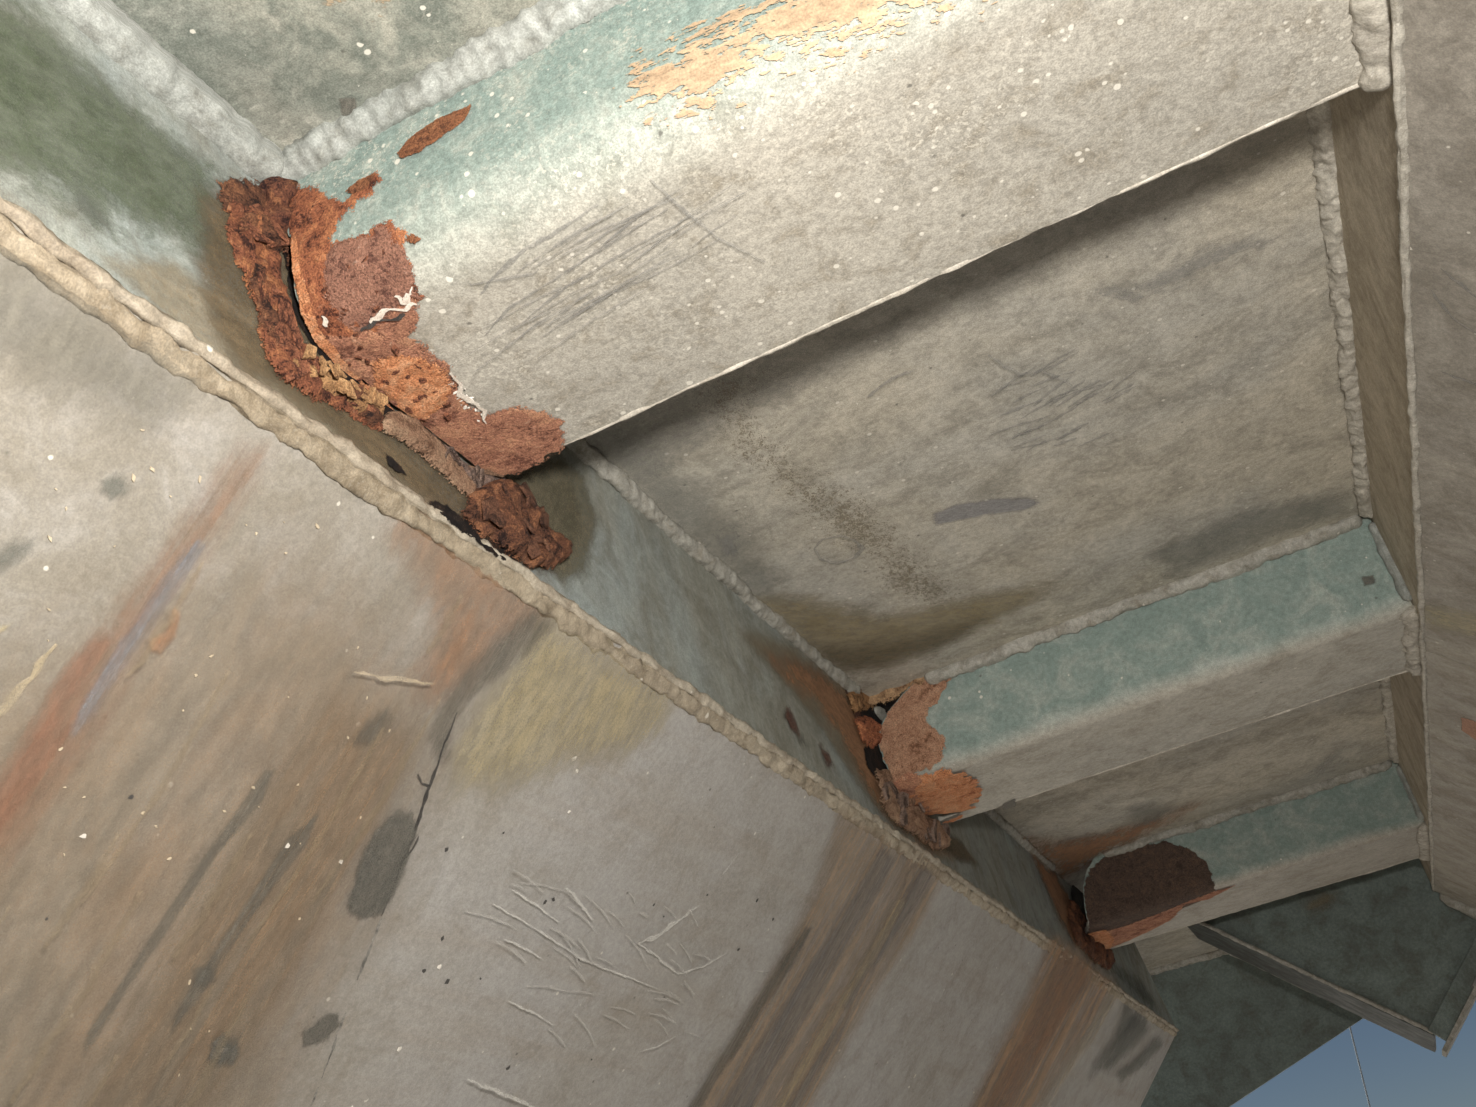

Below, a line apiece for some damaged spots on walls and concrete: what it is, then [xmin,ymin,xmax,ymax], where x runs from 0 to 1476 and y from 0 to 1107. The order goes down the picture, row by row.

corrosion [397,104,471,158]
peeling [612,0,956,129]
corrosion [216,172,569,498]
leakage [684,366,1038,666]
leakage [0,598,666,1107]
corrosion [754,641,982,856]
corrosion [1022,803,1235,958]